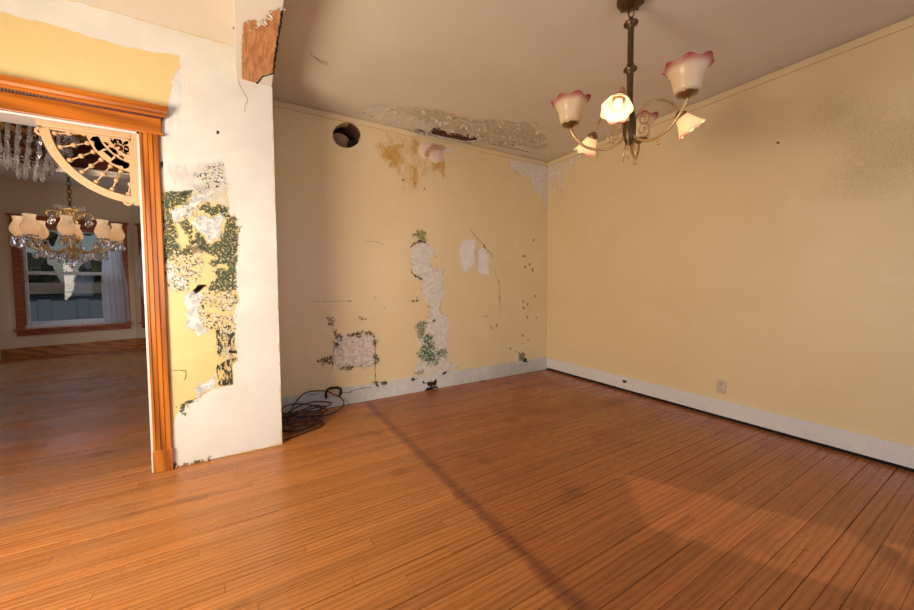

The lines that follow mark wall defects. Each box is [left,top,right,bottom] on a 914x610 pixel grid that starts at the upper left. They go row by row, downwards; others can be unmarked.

peeling [358,103,549,150]
damp [374,131,446,195]
peeling [509,153,586,210]
peeling [410,230,458,391]
peeling [317,318,380,370]